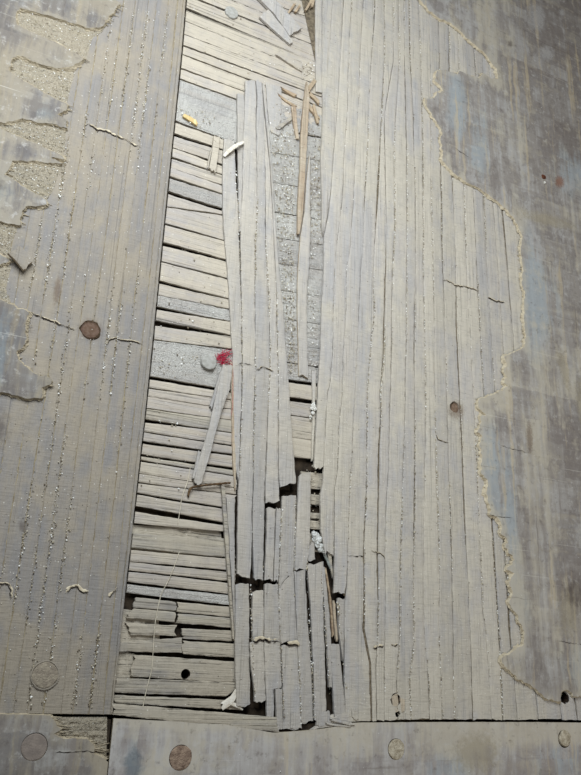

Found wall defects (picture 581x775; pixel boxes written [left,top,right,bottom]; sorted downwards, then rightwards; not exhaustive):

peeling [0,0,186,757]
crack [249,636,300,646]
peeling [220,0,581,730]
crack [443,279,504,303]